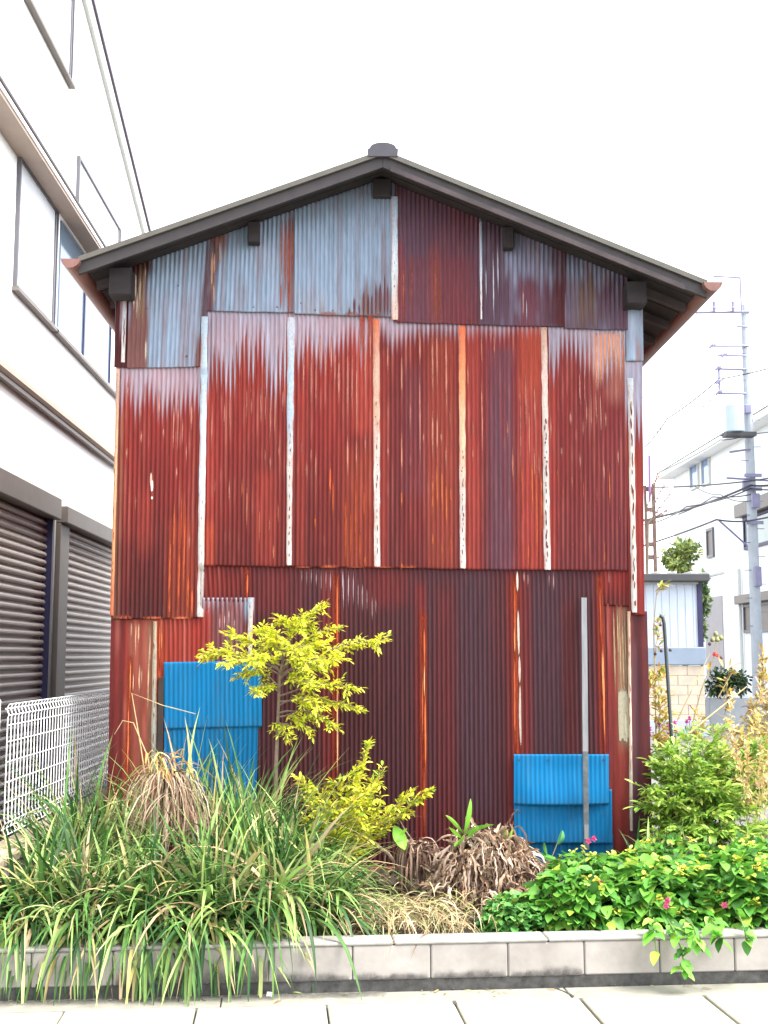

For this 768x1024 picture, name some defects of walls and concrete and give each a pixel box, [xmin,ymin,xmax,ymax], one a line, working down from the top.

rust [213,337,287,404]
rust [595,332,623,383]
rust [432,465,452,554]
rust [517,466,543,565]
rust [126,656,134,790]
rust [323,467,414,796]
rust [511,577,521,754]
rust [597,541,605,743]